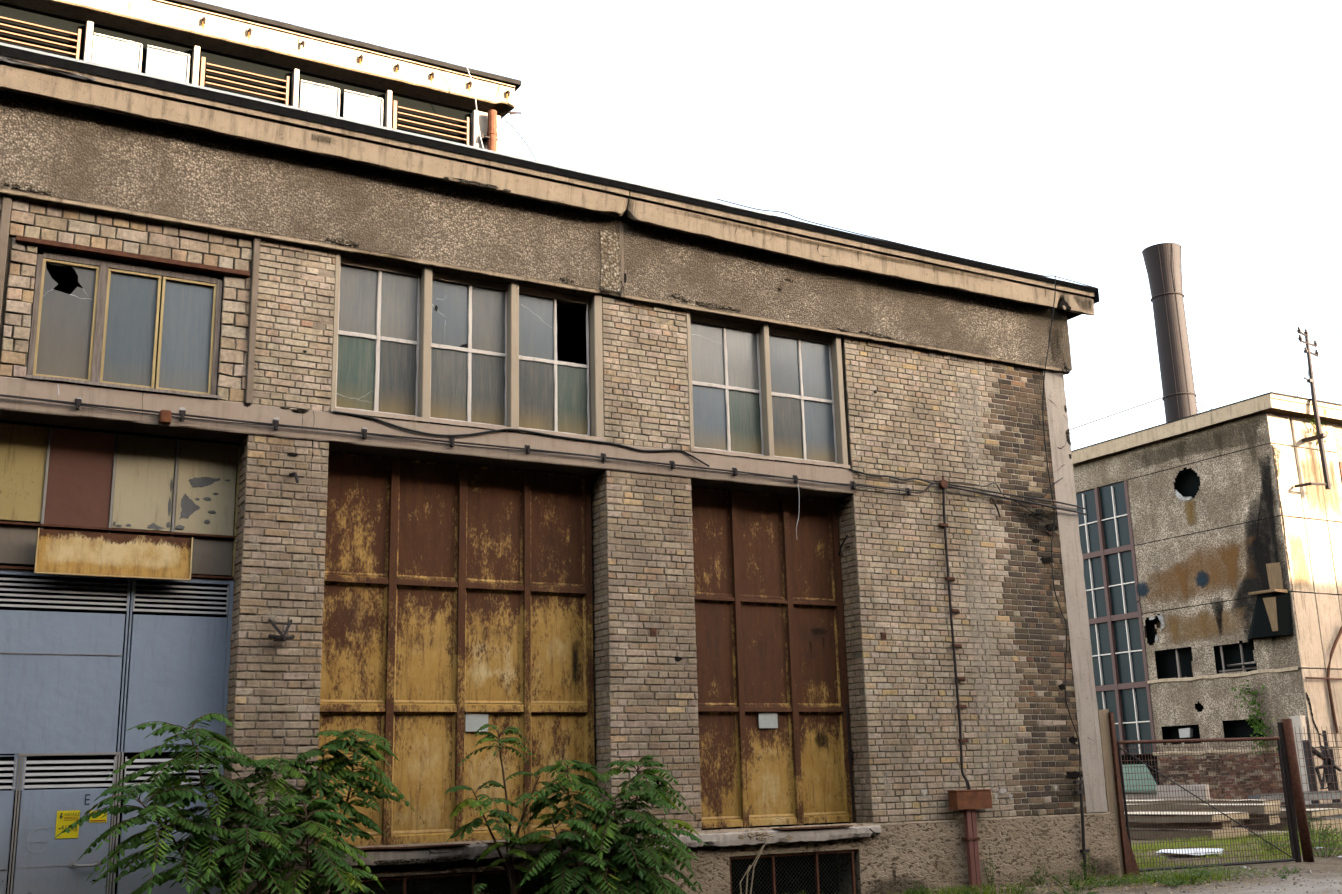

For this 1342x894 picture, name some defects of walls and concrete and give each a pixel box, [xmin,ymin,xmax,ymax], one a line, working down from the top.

peeling [113,477,230,531]
damp [1210,600,1223,633]